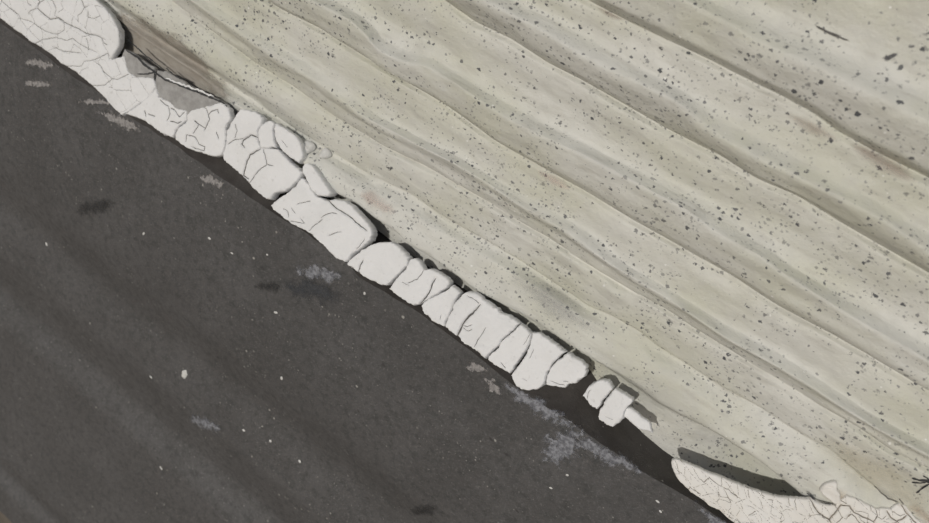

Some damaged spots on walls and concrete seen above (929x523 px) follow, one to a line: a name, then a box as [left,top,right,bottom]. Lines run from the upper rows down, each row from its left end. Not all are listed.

crack [0,0,285,182]
crack [285,200,367,273]
peeling [0,0,653,433]
crack [457,296,485,347]
crack [675,460,929,523]